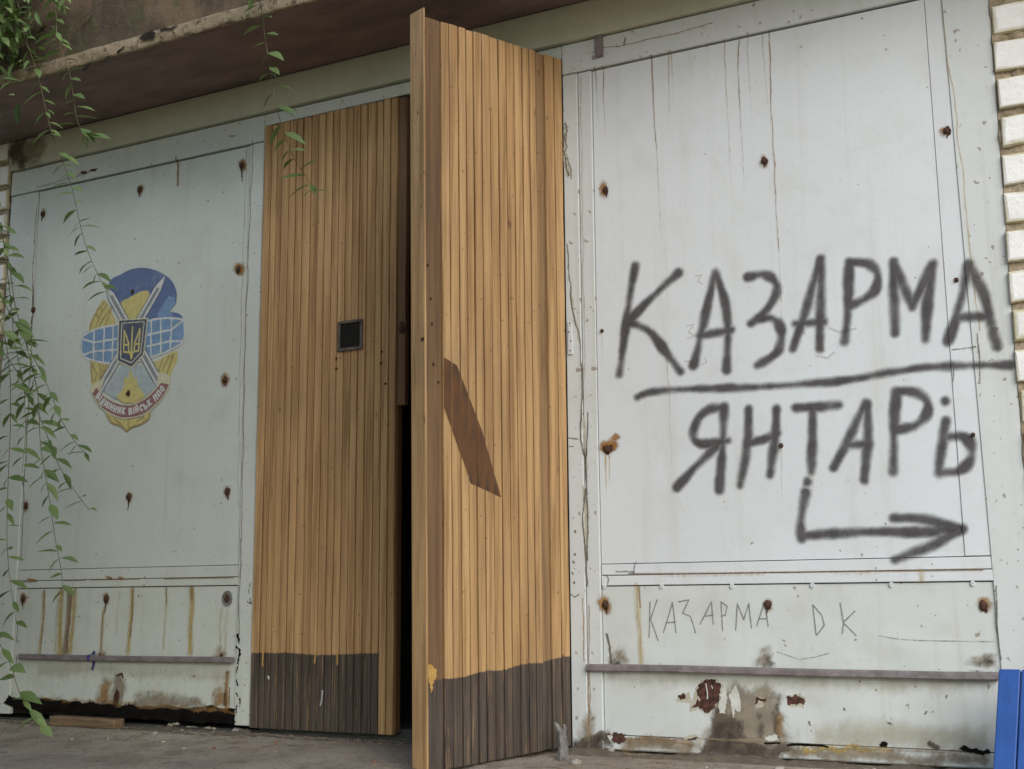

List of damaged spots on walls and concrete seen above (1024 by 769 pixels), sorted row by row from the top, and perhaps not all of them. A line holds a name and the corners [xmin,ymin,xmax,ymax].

rust [600,433,620,468]
rust [629,571,838,611]
rust [58,576,139,655]
rust [165,578,202,654]
rust [4,671,235,725]
peeling [677,679,741,718]
peeling [786,693,806,708]
rust [572,720,693,749]
damp [701,686,794,758]